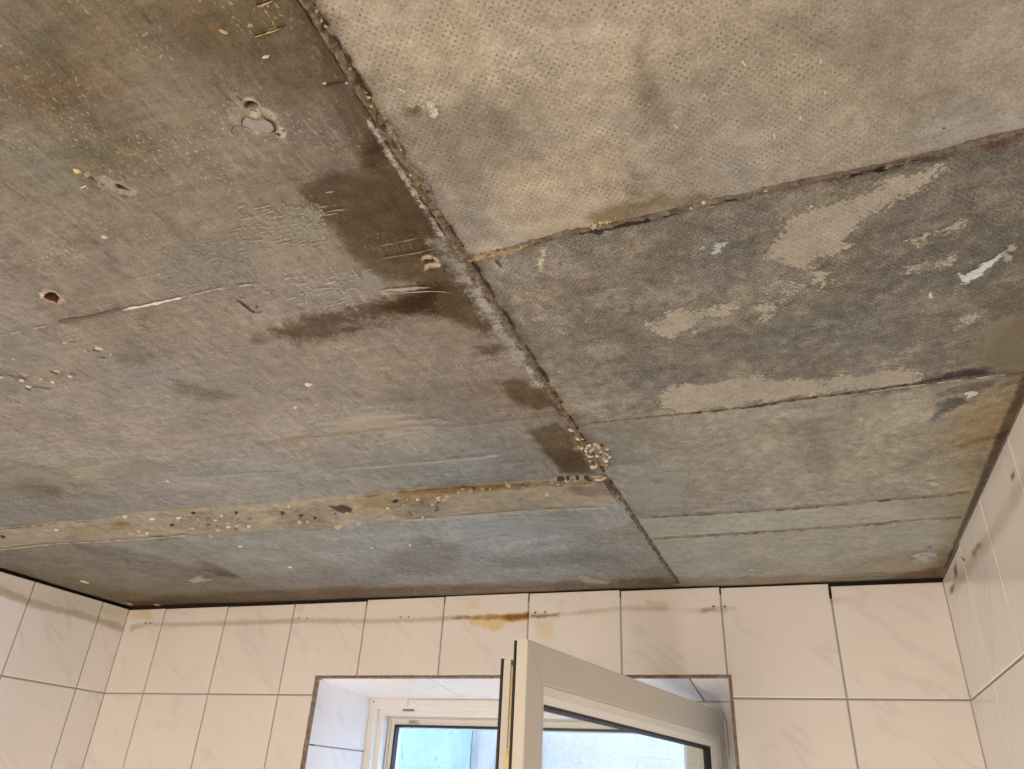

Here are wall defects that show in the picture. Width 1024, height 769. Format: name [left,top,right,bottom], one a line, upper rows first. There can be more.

spalling [188,70,326,158]
water stain [367,109,544,387]